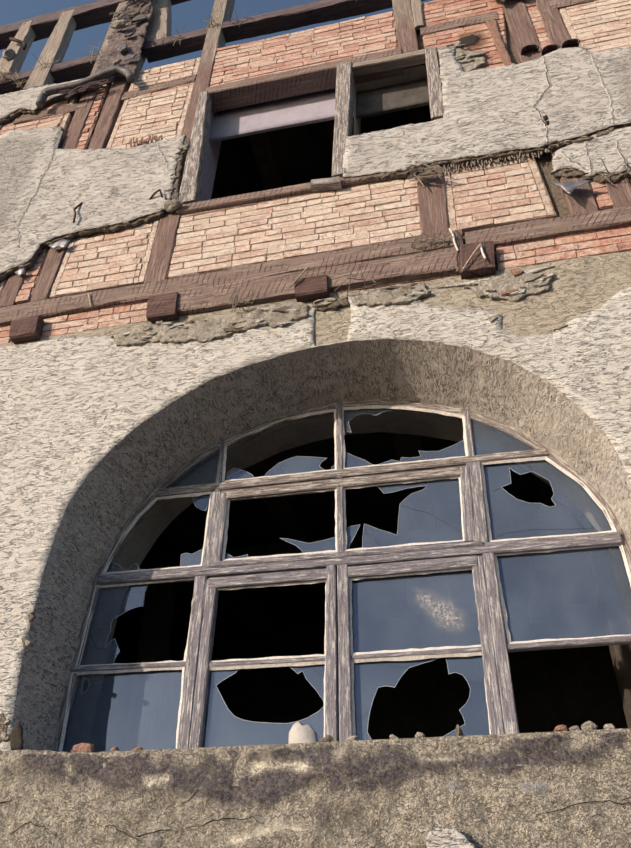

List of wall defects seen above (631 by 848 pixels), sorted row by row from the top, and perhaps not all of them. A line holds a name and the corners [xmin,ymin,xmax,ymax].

flaking render [437,19,514,72]
crack [532,56,552,143]
peeling [172,144,190,161]
peeling [545,136,594,147]
flaking render [110,251,631,347]
damp [24,732,625,805]
crack [105,788,264,847]
crack [536,795,631,817]